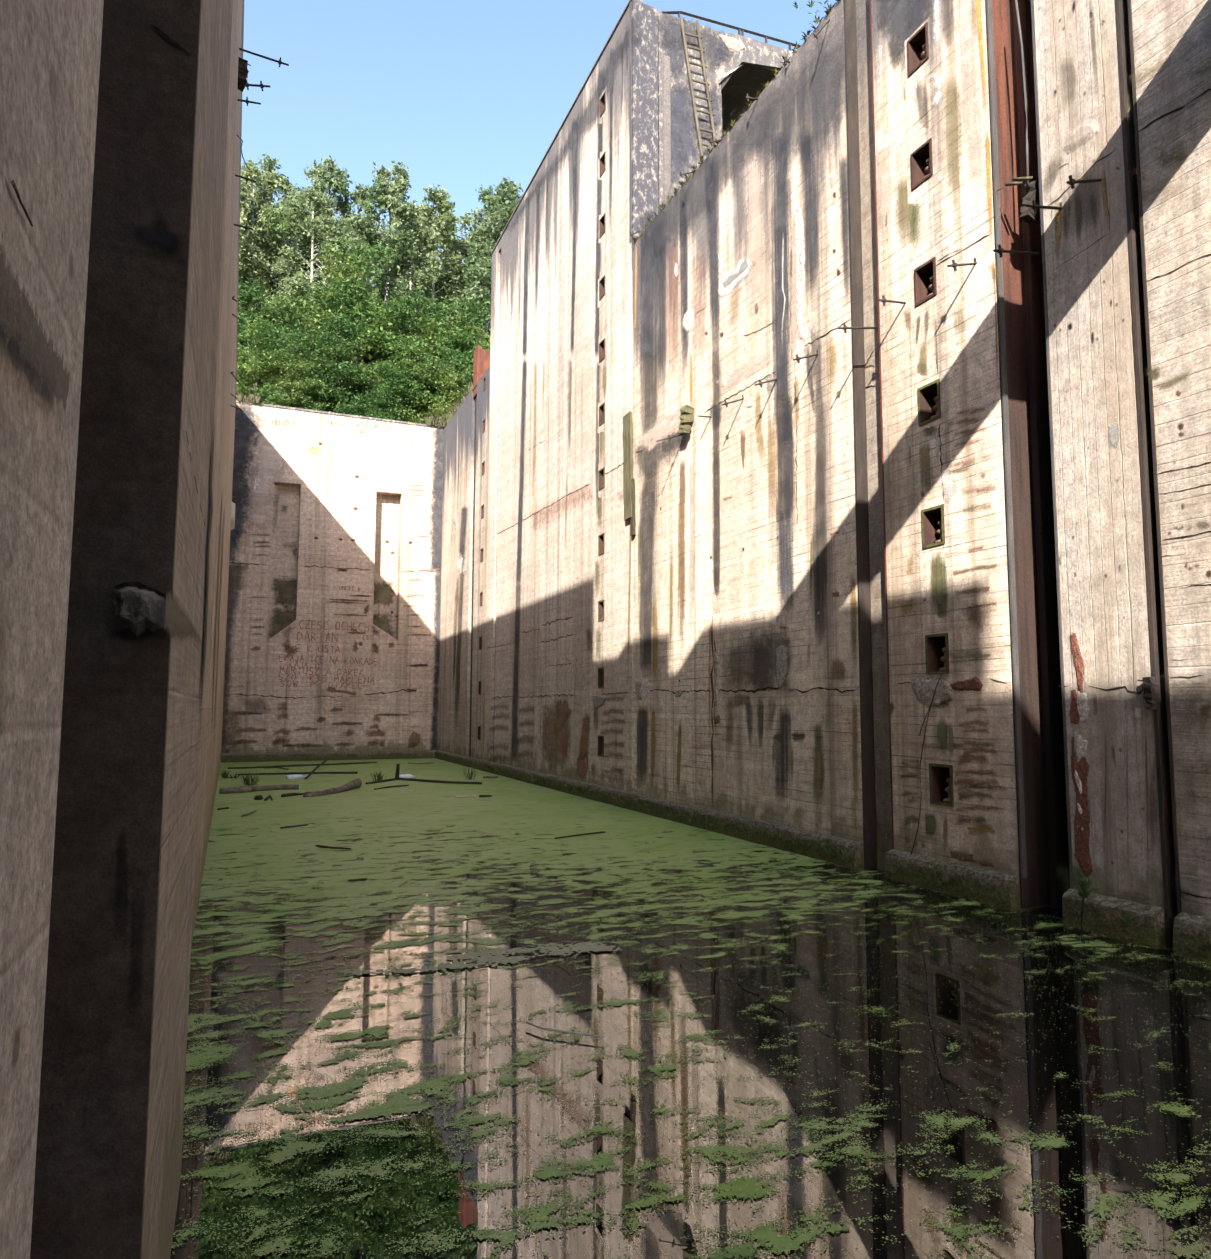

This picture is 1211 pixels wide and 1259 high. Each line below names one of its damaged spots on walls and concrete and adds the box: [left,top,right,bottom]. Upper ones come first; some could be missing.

corrosion [971,0,985,92]
crack [11,179,33,226]
water stain [840,160,850,287]
water stain [0,245,69,410]
water stain [637,47,842,667]
water stain [330,451,377,489]
water stain [221,404,288,752]
corrosion [543,697,624,779]
water stain [637,709,648,783]
crack [492,615,916,807]
water stain [727,627,793,796]
crack [1059,659,1202,695]